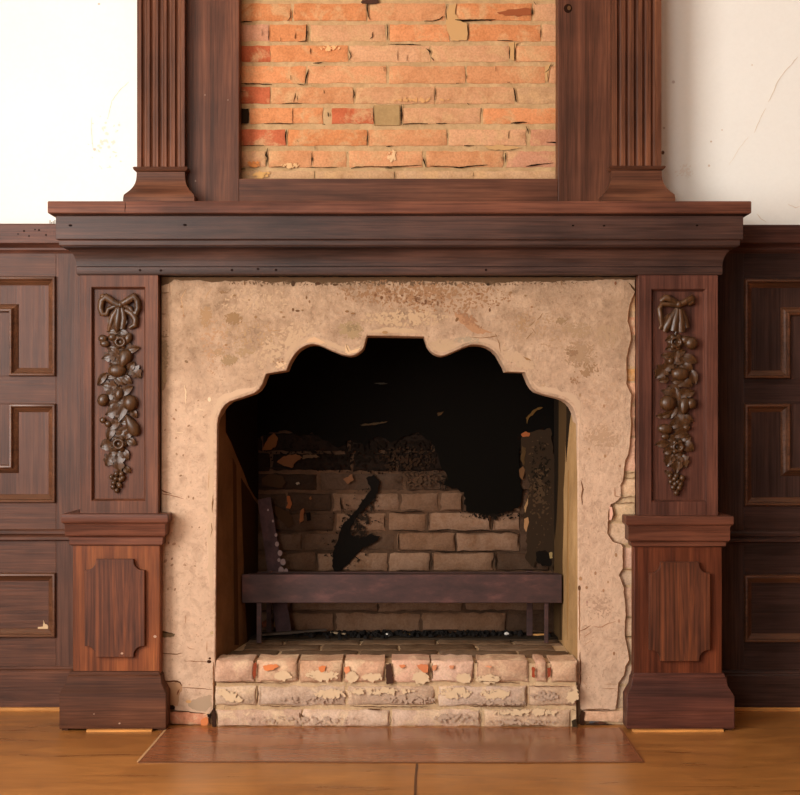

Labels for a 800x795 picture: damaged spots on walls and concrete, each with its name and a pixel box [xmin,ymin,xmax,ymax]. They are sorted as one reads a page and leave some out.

crack [730,57,798,163]
flaking render [619,293,635,495]
spalling [277,454,319,468]
spalling [519,432,530,480]
peeling [275,533,288,572]
flaking render [583,505,635,724]
spalling [253,662,279,679]
flaking render [167,682,210,725]